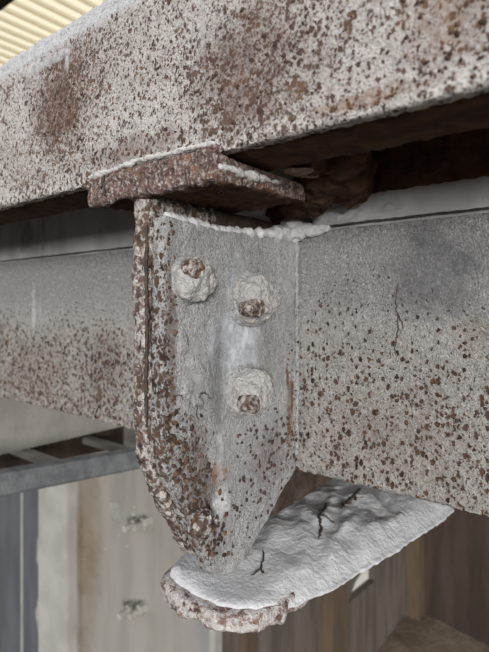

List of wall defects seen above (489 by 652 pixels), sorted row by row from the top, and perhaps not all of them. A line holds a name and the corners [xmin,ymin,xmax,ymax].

corrosion [448,22,461,38]
corrosion [420,46,453,79]
leakage [312,205,358,224]
crack [394,283,403,351]
corrosion [163,313,178,408]
leakage [211,484,228,521]
crack [317,488,361,539]
crack [251,551,265,576]